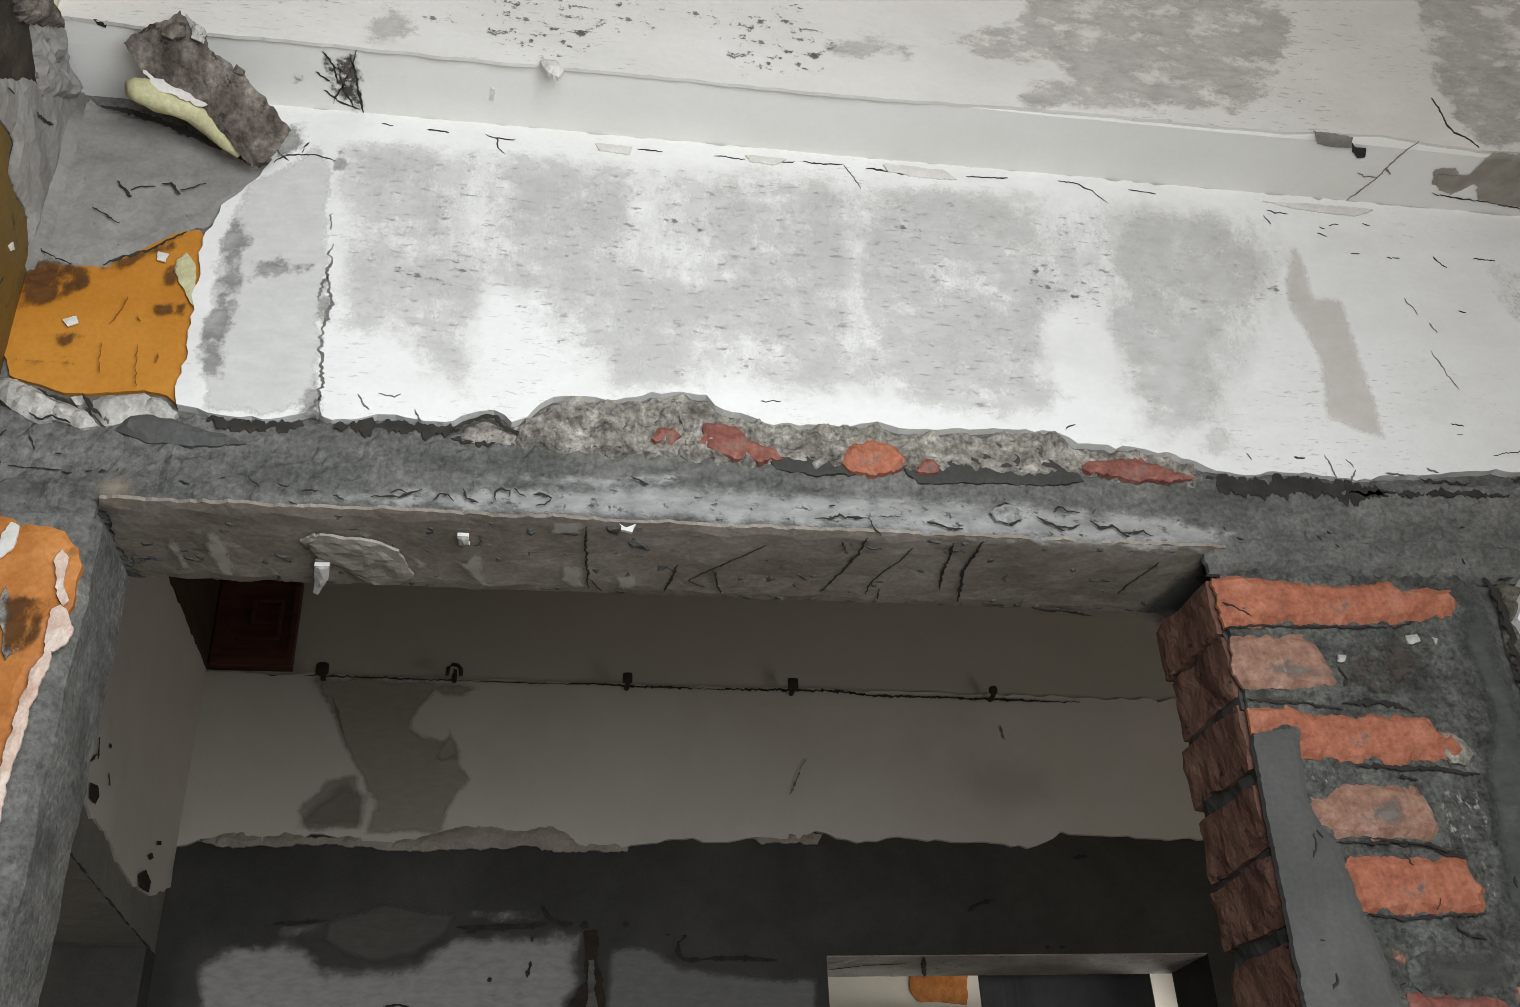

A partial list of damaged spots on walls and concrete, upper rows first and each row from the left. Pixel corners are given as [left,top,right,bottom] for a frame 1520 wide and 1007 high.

crack [1346,98,1479,201]
peeling [0,123,204,431]
peeling [354,150,1222,407]
spalling [461,392,1203,488]
crack [584,526,602,591]
crack [664,545,767,593]
peeling [0,516,84,822]
spalling [1440,733,1473,767]